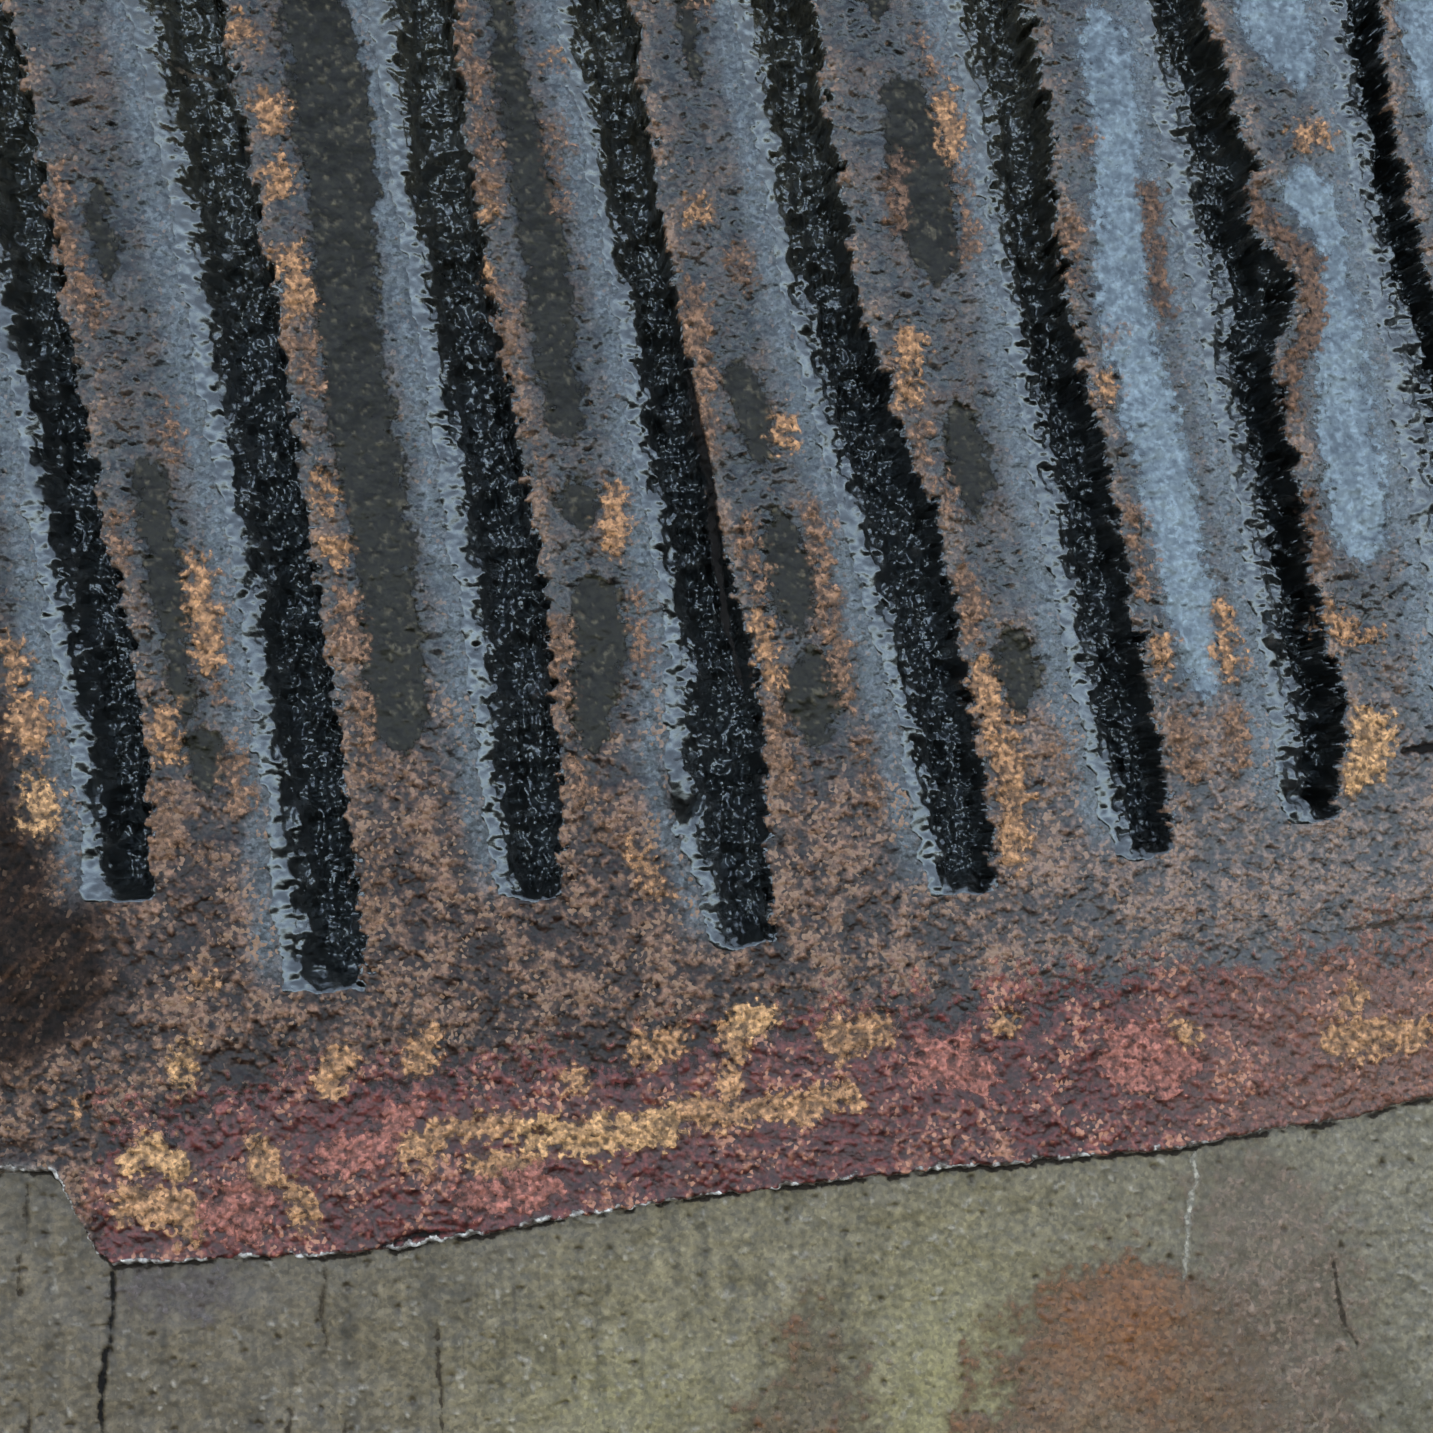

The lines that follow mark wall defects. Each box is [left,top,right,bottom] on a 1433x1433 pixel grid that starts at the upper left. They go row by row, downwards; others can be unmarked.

rust [262,237,328,399]
rust [0,628,71,906]
rust [180,545,233,705]
rust [949,558,1084,876]
rust [1341,705,1401,800]
peeling [0,1164,25,1172]
crack [95,1249,271,1433]
crack [284,1408,292,1433]
crack [435,1329,444,1430]
peeling [48,893,1433,1266]
crack [307,1098,1433,1347]
rust [948,1151,1375,1433]